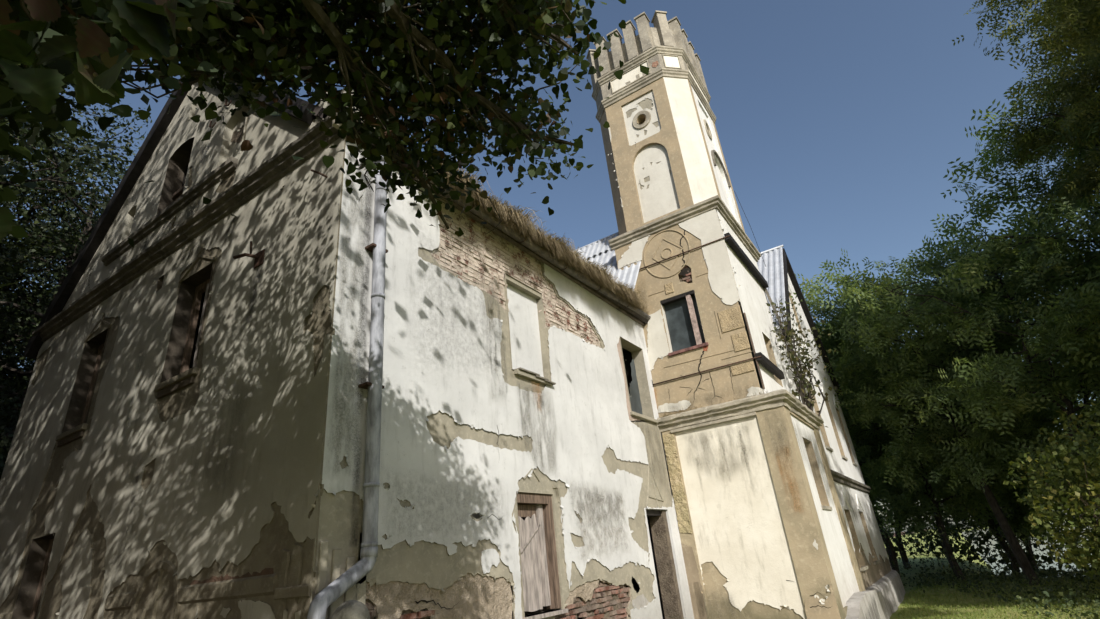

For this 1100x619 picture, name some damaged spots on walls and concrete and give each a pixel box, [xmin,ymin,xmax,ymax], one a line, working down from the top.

crack [678,230,692,283]
flaking render [155,244,222,422]
peeling [305,285,335,372]
flaking render [326,198,762,619]
crack [669,346,735,408]
flaking render [0,313,120,613]
peeling [139,460,155,489]
flaking render [36,483,364,619]
flaking render [681,543,841,619]